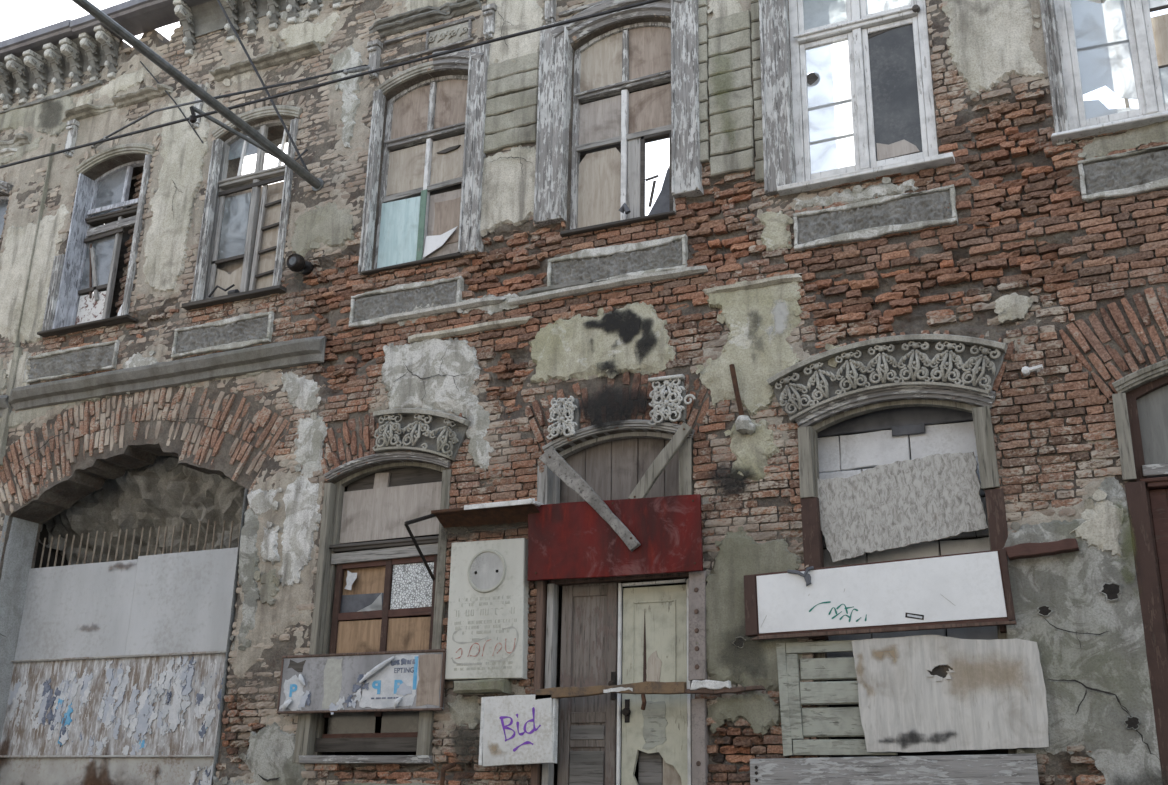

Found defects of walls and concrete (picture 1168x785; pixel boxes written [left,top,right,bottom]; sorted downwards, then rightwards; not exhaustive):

peeling [405,0,457,11]
peeling [486,0,545,65]
peeling [707,0,743,20]
spalling [942,0,1168,230]
spalling [670,177,919,269]
spalling [695,239,1079,481]
peeling [0,396,112,431]
peeling [230,201,676,658]
peeling [1003,476,1162,785]
rust [0,740,9,766]
rust [83,753,123,785]
crack [1049,679,1161,761]